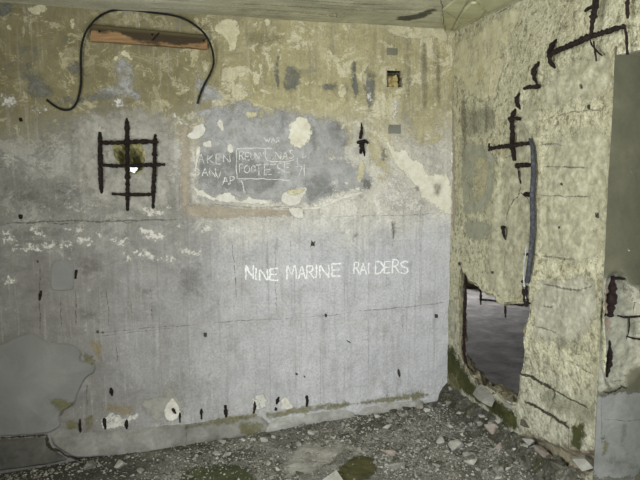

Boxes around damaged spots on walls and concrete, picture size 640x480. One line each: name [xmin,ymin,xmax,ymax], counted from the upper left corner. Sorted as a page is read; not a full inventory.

peeling [28,5,47,15]
peeling [215,19,240,51]
spalling [72,99,172,216]
peeling [173,113,212,179]
peeling [194,187,270,205]
peeling [288,117,313,148]
peeling [254,122,369,225]
spalling [381,0,640,406]
crack [520,373,626,449]